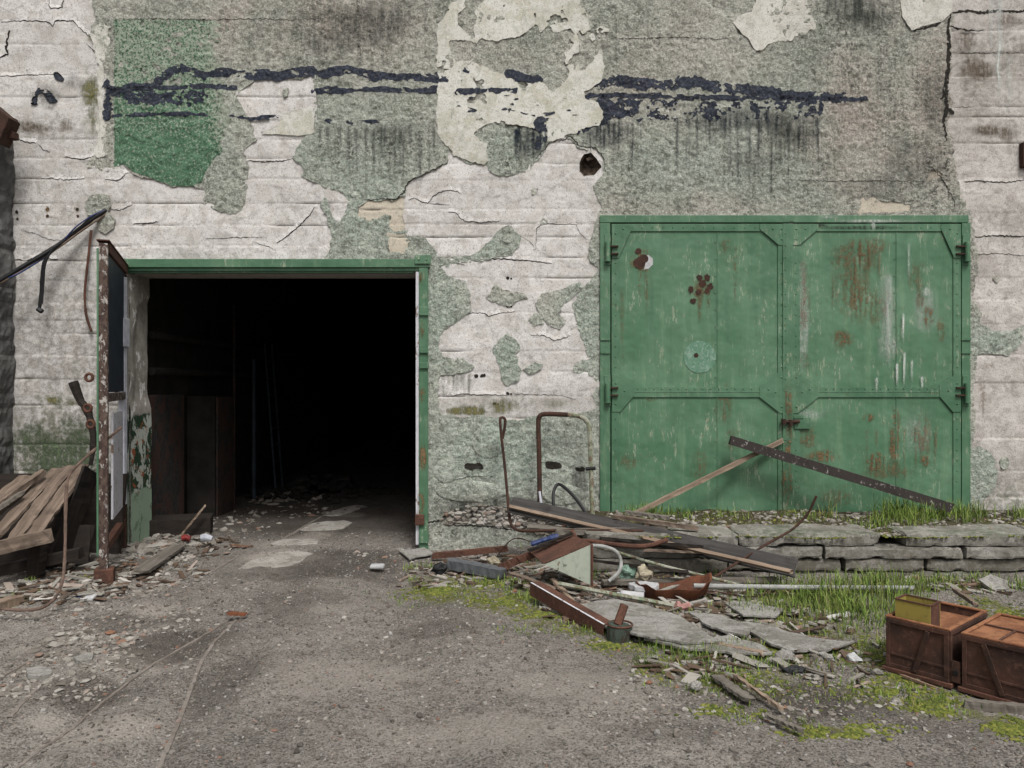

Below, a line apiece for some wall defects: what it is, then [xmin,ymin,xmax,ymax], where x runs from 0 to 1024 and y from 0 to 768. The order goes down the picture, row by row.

crack [912,9,1024,141]
water stain [514,126,546,153]
water stain [716,112,800,157]
crack [207,206,314,250]
peeling [0,0,603,473]
peeling [947,0,1024,510]
corrosion [688,274,713,316]